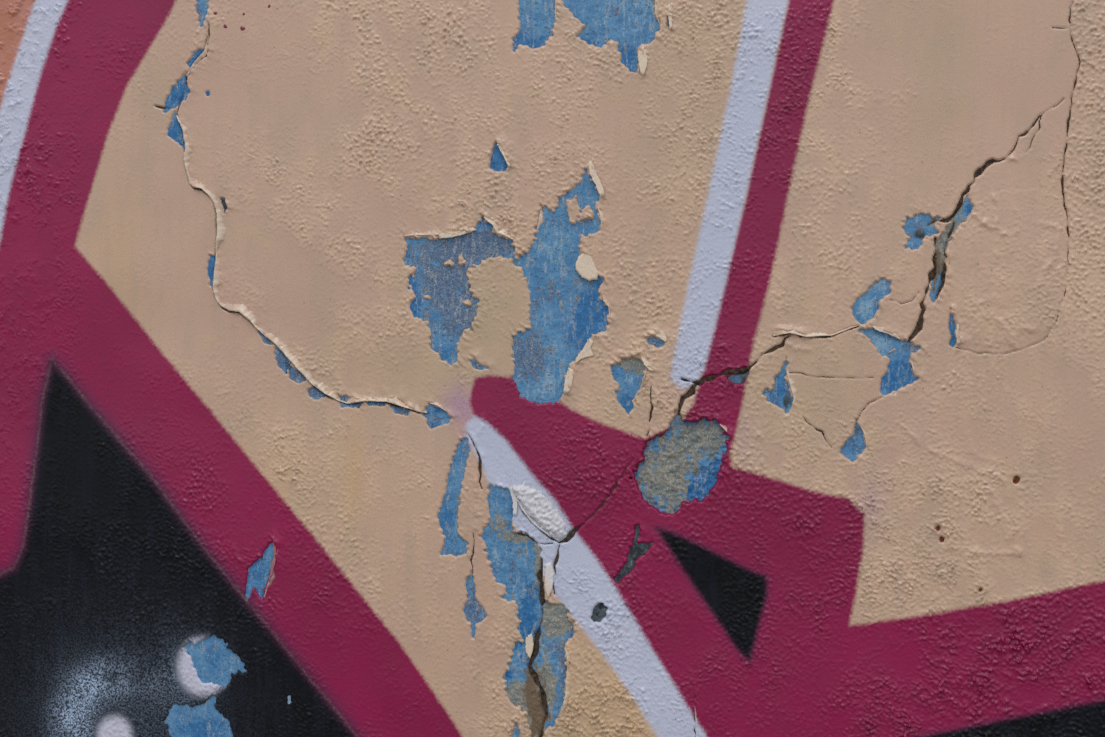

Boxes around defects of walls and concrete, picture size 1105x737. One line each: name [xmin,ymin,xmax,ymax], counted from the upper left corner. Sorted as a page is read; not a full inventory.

peeling [513,0,673,76]
crack [155,26,427,416]
crack [901,8,1081,345]
peeling [404,160,610,404]
crack [647,325,859,436]
peeling [852,278,921,395]
peeling [437,438,470,556]
spalling [634,414,730,514]
peeling [245,543,278,599]
peeling [480,485,575,737]
crack [515,465,629,737]
peeling [164,634,247,737]